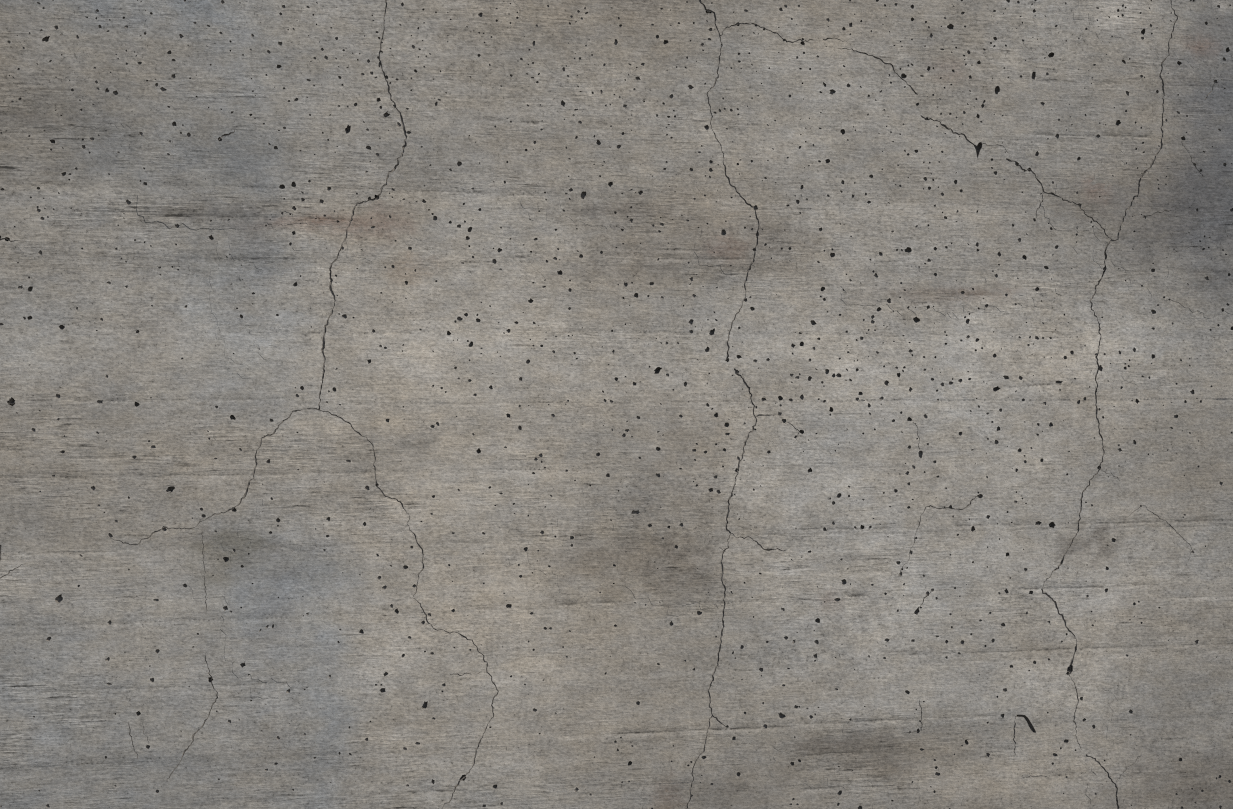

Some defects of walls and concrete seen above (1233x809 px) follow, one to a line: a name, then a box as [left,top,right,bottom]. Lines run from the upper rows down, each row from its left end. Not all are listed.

crack [111,0,499,809]
crack [686,0,1203,809]